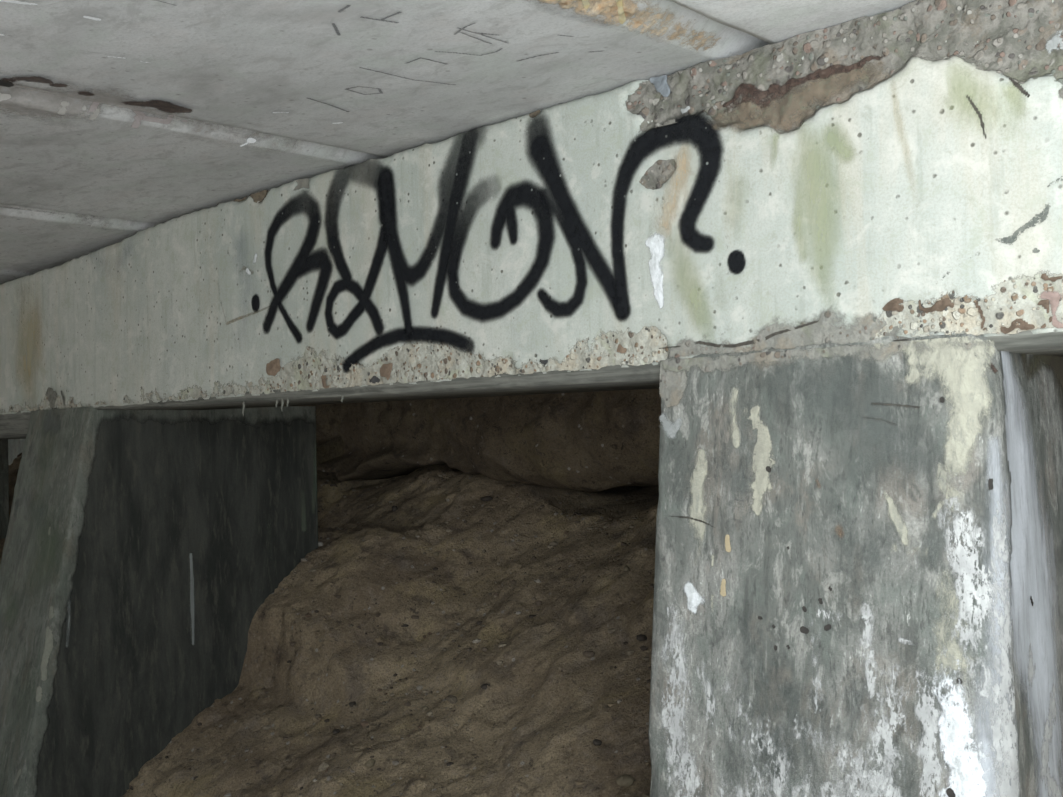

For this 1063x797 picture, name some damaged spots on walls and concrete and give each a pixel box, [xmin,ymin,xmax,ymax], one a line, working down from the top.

rust [538,0,721,50]
spalling [625,0,1063,134]
spalling [1,387,106,418]
spalling [123,326,669,403]
leakage [720,351,1063,797]
peeling [36,606,54,702]
leakage [661,582,731,797]